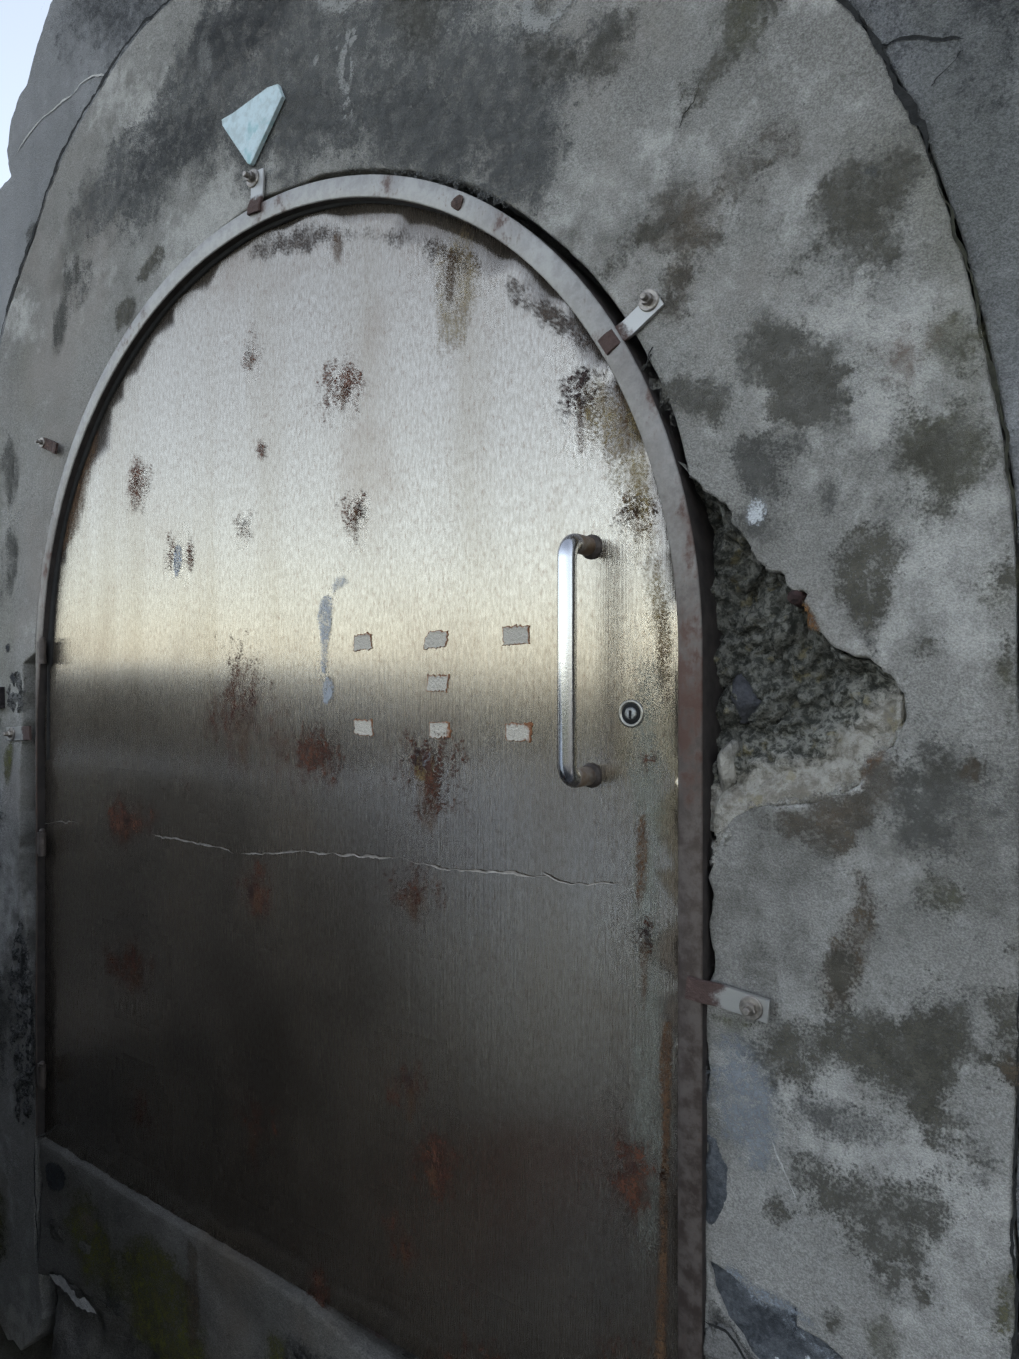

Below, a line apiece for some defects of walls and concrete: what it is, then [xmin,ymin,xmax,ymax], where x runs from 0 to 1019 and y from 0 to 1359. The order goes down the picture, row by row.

damp [70,0,635,281]
damp [778,127,924,297]
damp [53,253,92,349]
damp [115,298,135,332]
crack [836,0,1019,542]
corrosion [316,359,366,422]
corrosion [126,458,152,514]
corrosion [335,489,365,550]
spalling [687,464,907,864]
corrosion [380,722,481,827]
corrosion [654,1022,672,1359]
peeling [703,1261,843,1359]